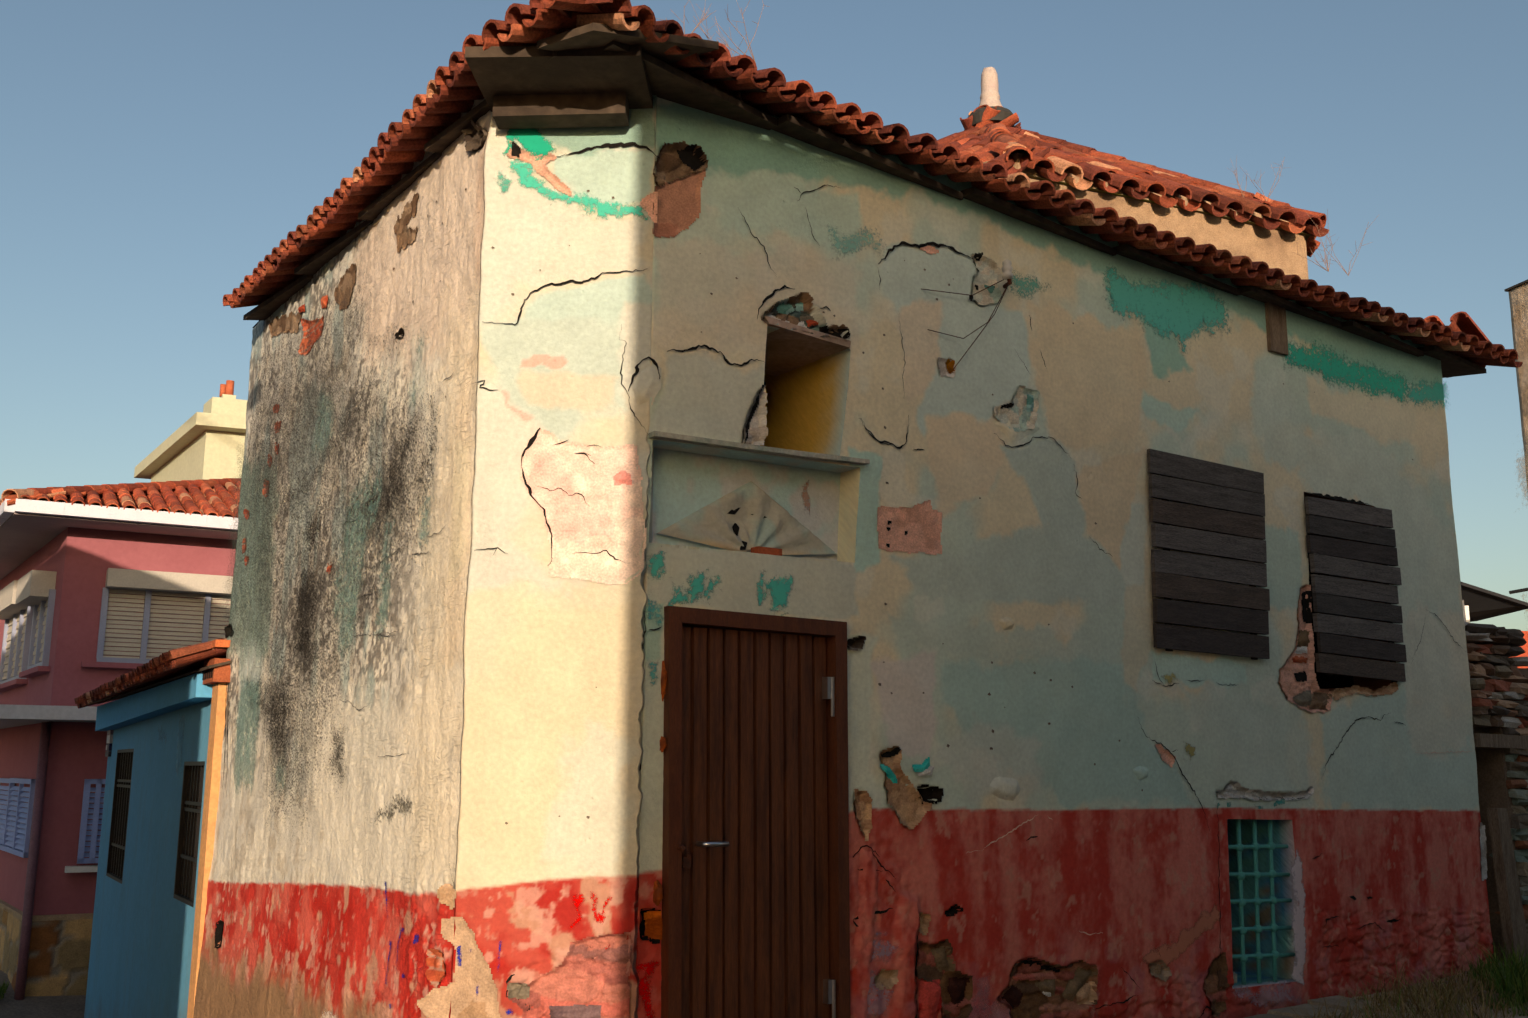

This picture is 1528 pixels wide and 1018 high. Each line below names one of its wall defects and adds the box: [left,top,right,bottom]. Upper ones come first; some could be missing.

crack [482,269,645,325]
crack [878,241,973,290]
crack [859,322,924,450]
spalling [992,385,1040,432]
water stain [224,263,444,861]
flaking render [520,428,647,585]
flaking render [877,500,942,555]
flaking render [1278,584,1399,713]
spalling [853,746,944,841]
spalling [1216,781,1314,801]
peeling [385,884,513,1018]
peeling [918,979,942,1018]